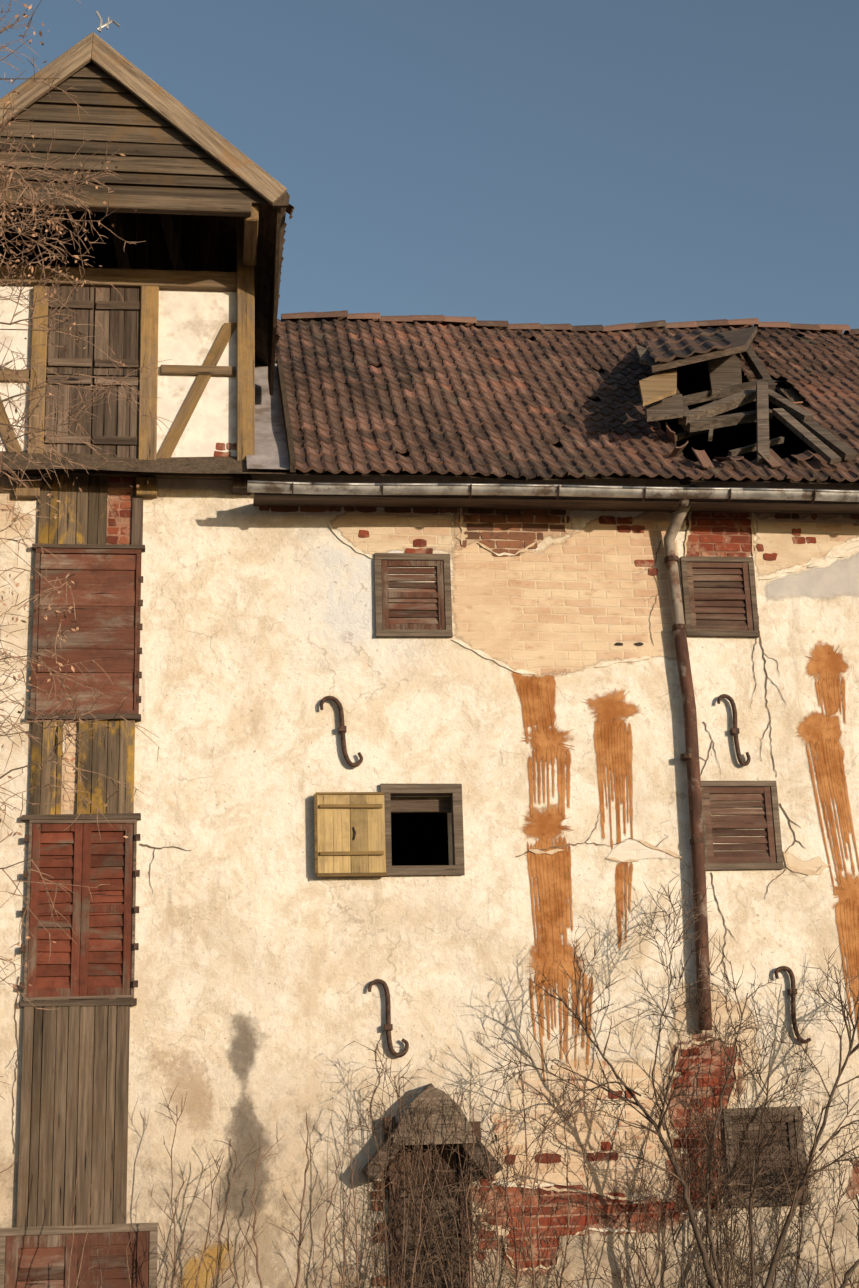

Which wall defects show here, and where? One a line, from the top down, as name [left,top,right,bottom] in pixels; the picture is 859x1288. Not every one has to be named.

peeling [259,506,859,677]
corrosion [512,672,593,1082]
corrosion [581,689,639,949]
crack [750,615,805,899]
corrosion [797,642,859,1036]
leakage [181,1244,230,1288]
leakage [228,1017,256,1080]
leakage [217,1097,268,1217]
peeling [470,983,760,1277]
flaking render [847,1160,859,1201]